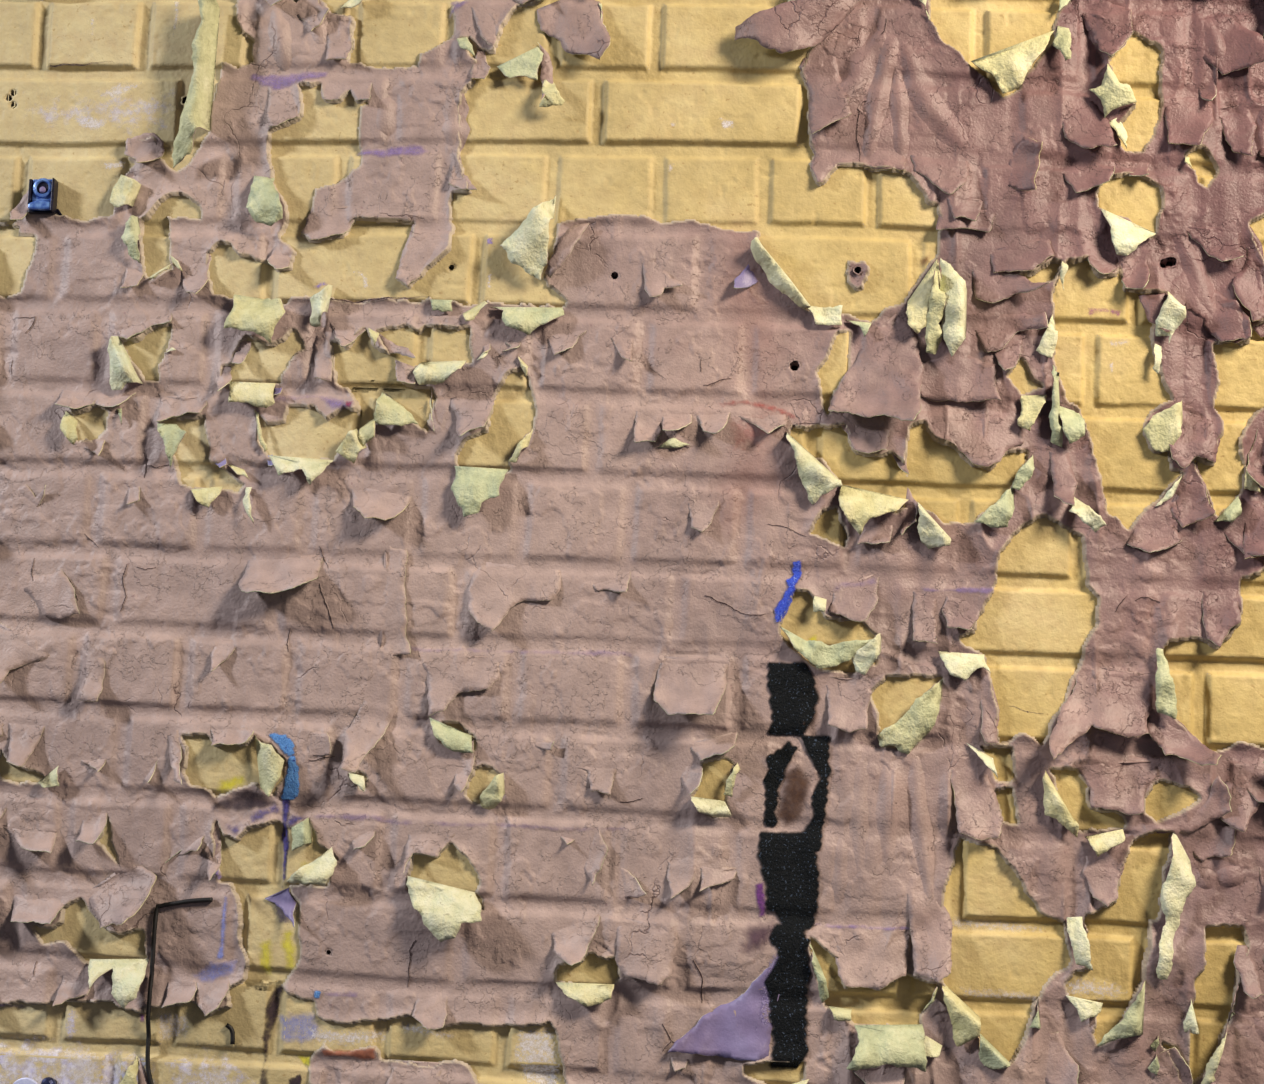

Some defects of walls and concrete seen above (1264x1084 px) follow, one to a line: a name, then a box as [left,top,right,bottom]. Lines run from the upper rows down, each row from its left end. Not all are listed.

peeling [0,0,1264,559]
peeling [238,555,323,594]
peeling [467,562,561,632]
peeling [653,656,728,715]
peeling [144,728,285,797]
peeling [307,700,398,792]
peeling [422,656,505,810]
peeling [680,732,741,818]
peeling [780,518,1264,1084]
peeling [0,808,565,1084]
peeling [552,914,677,1007]
peeling [668,961,810,1084]